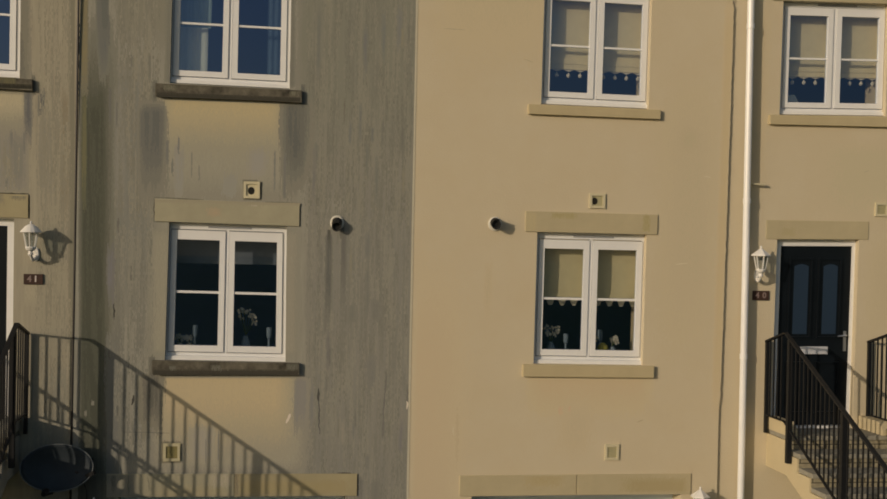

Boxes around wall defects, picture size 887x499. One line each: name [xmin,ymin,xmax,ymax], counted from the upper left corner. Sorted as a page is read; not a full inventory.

leakage [0,0,87,449]
leakage [104,0,544,499]